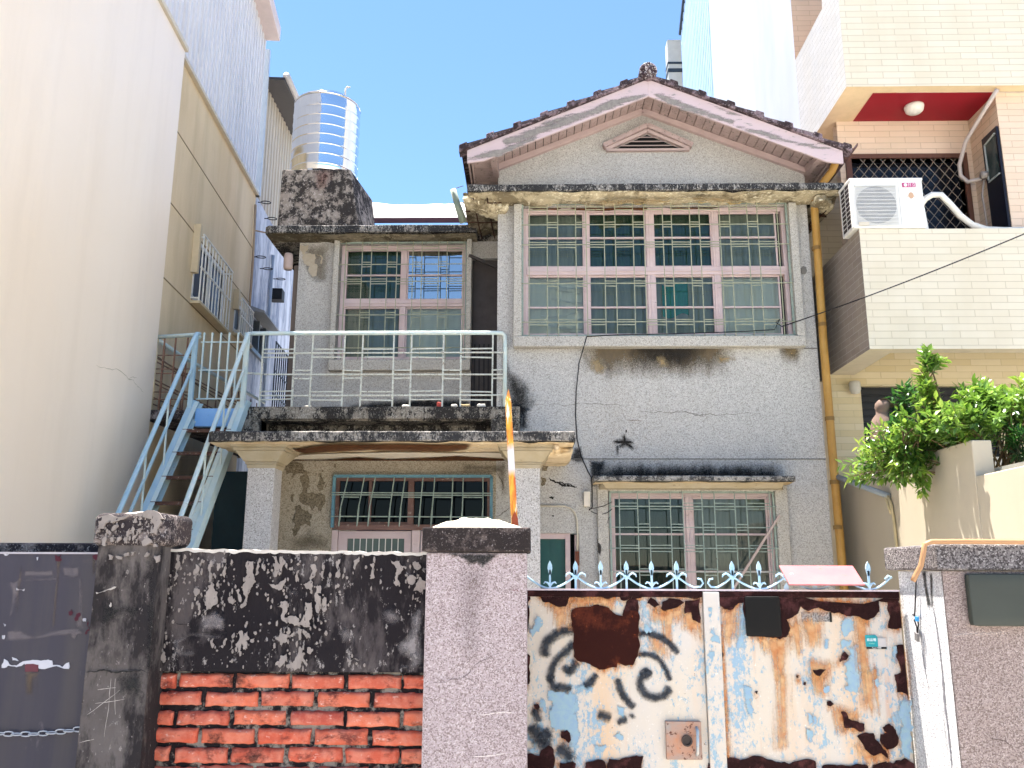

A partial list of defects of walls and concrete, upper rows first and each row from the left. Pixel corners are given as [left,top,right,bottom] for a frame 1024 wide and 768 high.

peeling [300,245,323,277]
water stain [584,349,729,372]
water stain [782,349,798,359]
water stain [507,371,532,429]
water stain [572,449,777,486]
spalling [285,452,503,537]
peeling [96,510,164,563]
peeling [160,551,426,672]
rust [513,590,702,672]
rust [719,597,915,768]
rust [527,730,643,768]